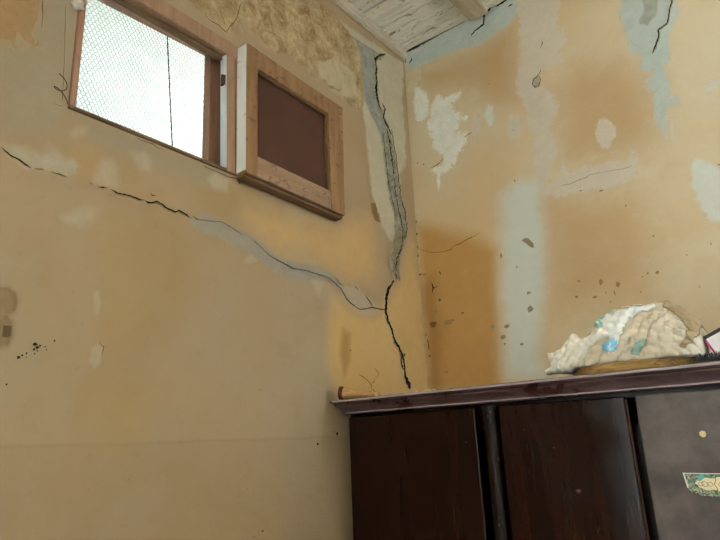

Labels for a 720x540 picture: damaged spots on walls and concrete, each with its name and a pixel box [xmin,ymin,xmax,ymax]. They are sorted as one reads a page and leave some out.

crack [0,147,67,178]
crack [90,182,241,234]
flaking render [175,0,408,283]
crack [260,53,476,390]
peeling [404,0,646,205]
peeling [610,0,692,152]
crack [652,0,673,53]
peeling [335,282,383,319]